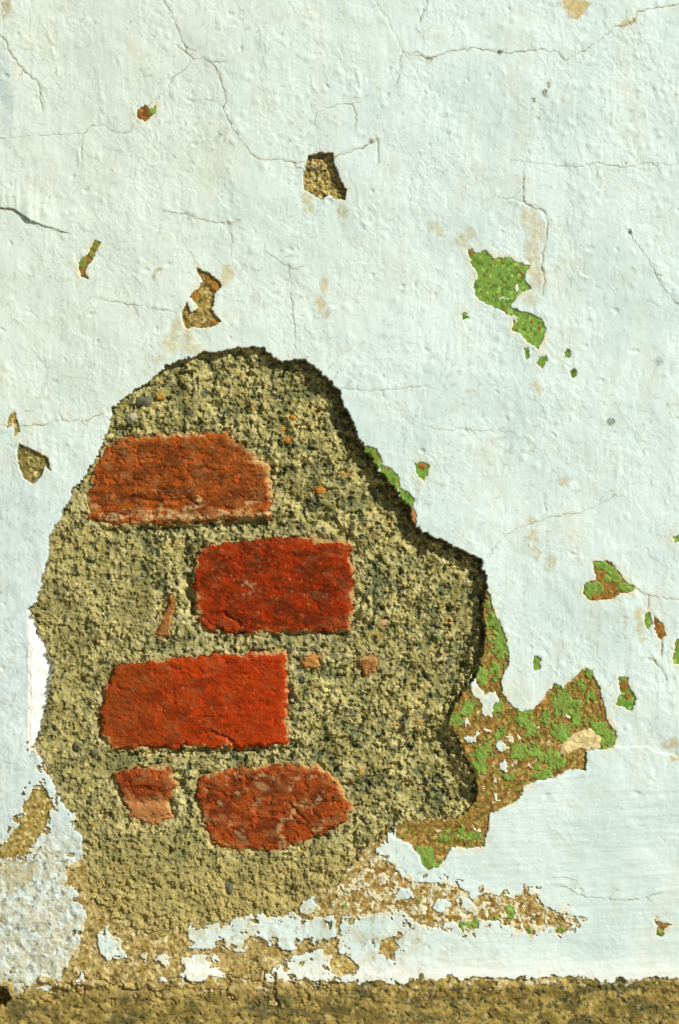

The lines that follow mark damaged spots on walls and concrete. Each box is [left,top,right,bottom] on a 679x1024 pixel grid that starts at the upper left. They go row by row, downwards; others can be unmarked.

crack [0,2,379,168]
crack [376,2,679,85]
peeling [304,154,345,199]
peeling [79,241,100,279]
peeling [182,269,221,328]
peeling [468,249,547,368]
crack [503,159,674,287]
crack [1,404,101,427]
flaking render [0,348,636,1007]
peeling [644,612,679,664]